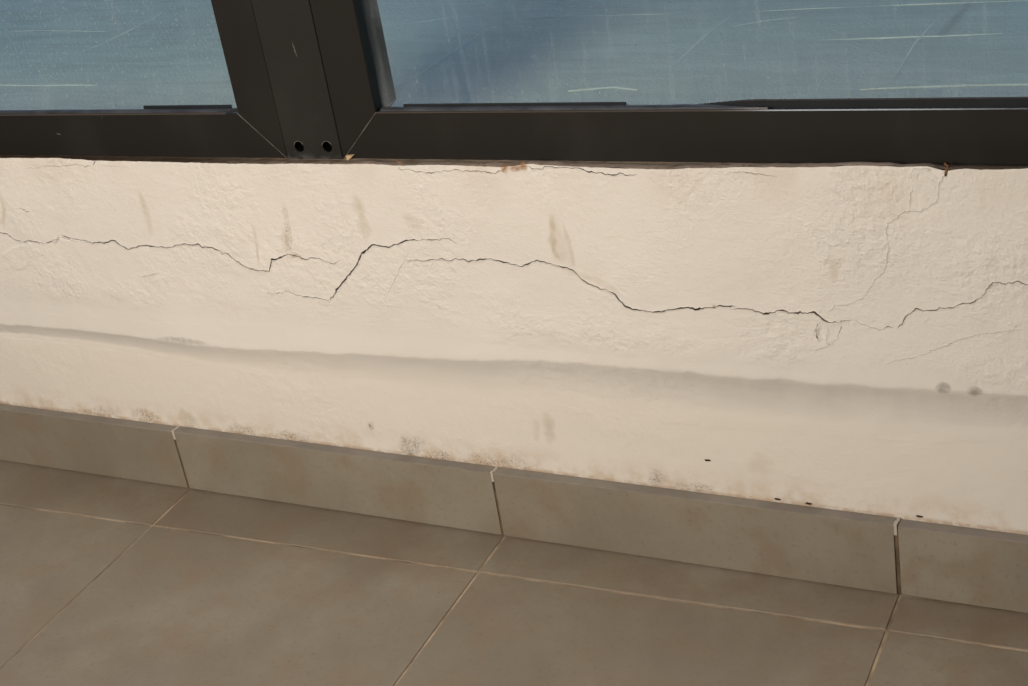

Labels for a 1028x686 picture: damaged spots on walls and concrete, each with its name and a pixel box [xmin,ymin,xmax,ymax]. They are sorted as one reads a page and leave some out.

crack [0,175,1028,331]